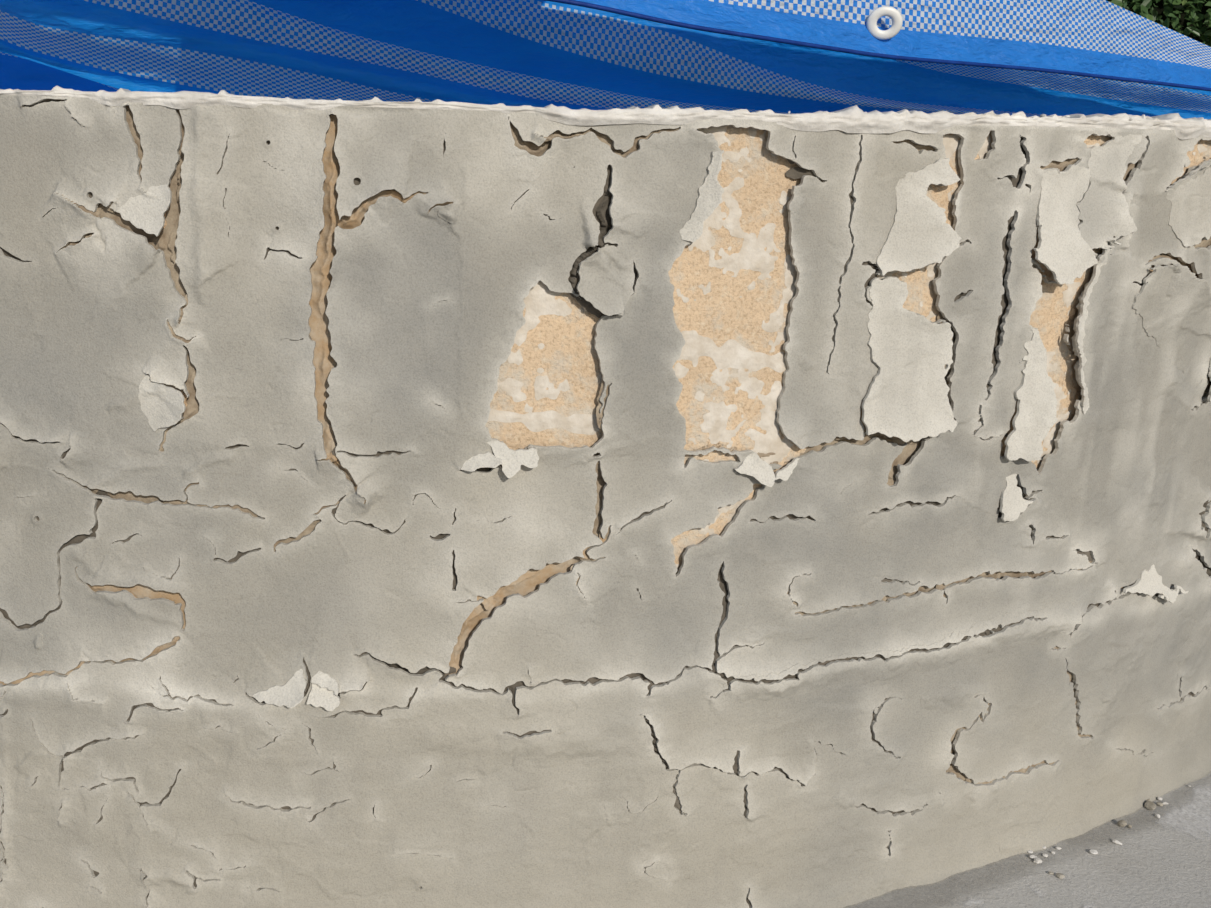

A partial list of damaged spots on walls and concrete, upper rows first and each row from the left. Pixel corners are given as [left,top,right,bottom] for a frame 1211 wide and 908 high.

crack [24,99,67,107]
flaking render [116,184,172,237]
crack [0,105,1055,822]
spalling [460,245,635,478]
spalling [668,125,808,574]
flaking render [862,133,962,442]
crack [787,476,1093,615]
crack [974,137,1078,440]
flaking render [999,134,1142,521]
crack [1133,237,1211,286]
crack [1193,501,1211,576]
flaking render [253,669,340,711]